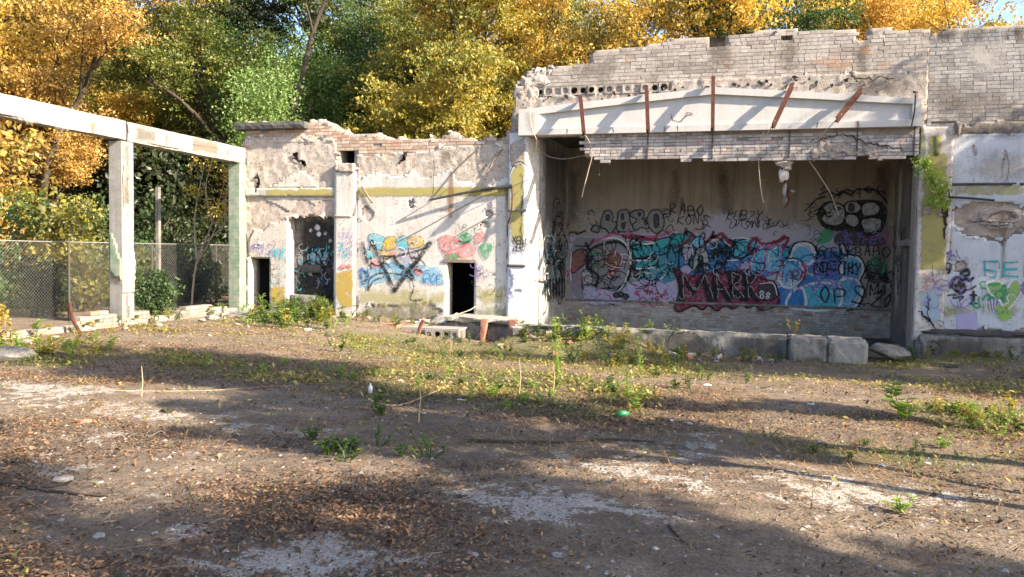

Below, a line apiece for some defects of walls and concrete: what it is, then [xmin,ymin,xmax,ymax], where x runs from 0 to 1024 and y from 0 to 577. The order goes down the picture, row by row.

spalling [518,73,550,106]
spalling [808,139,885,162]
flaking render [920,201,1024,244]